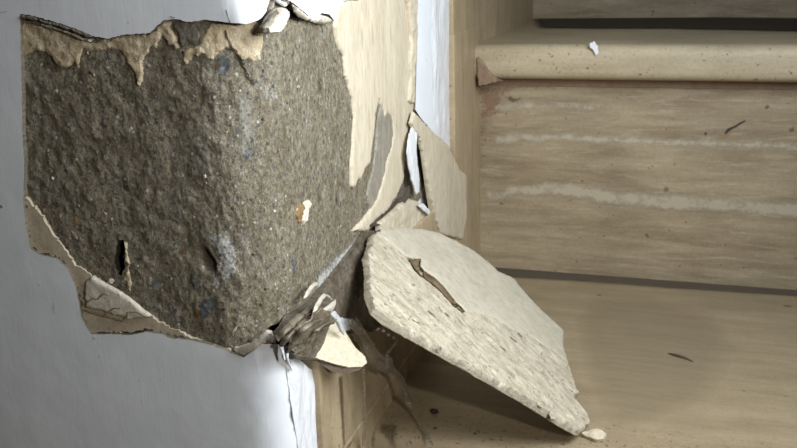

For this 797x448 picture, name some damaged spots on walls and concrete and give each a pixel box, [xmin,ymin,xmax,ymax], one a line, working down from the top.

spalling [22,0,430,356]
crack [225,10,256,85]